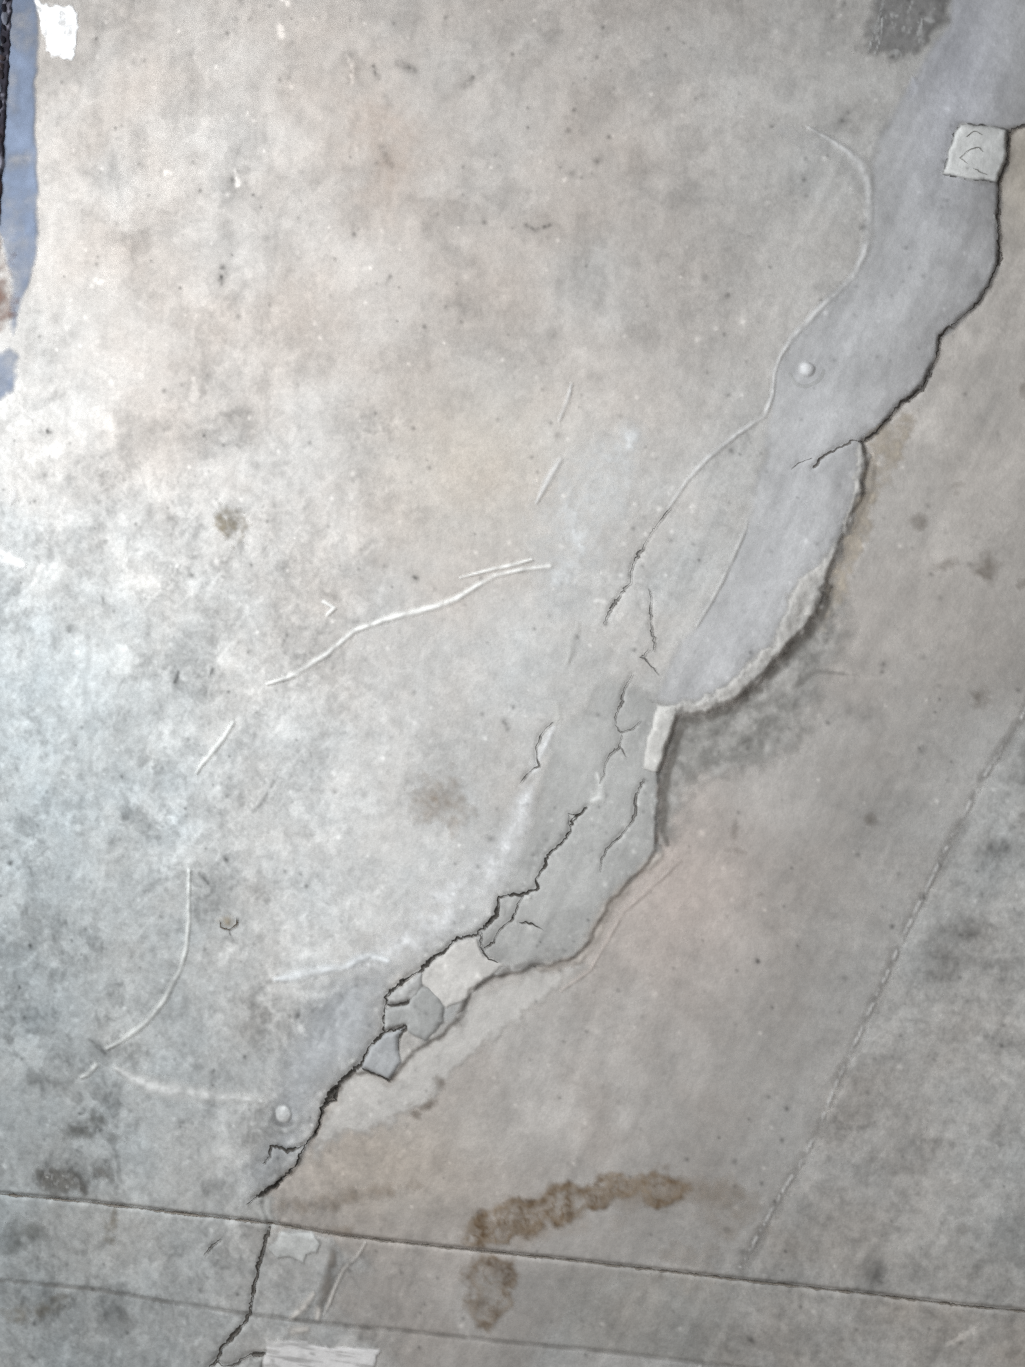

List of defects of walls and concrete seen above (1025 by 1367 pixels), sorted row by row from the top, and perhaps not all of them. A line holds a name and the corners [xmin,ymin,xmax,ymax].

crack [792,124,1025,468]
crack [209,508,670,1367]
spalling [252,126,1025,1367]